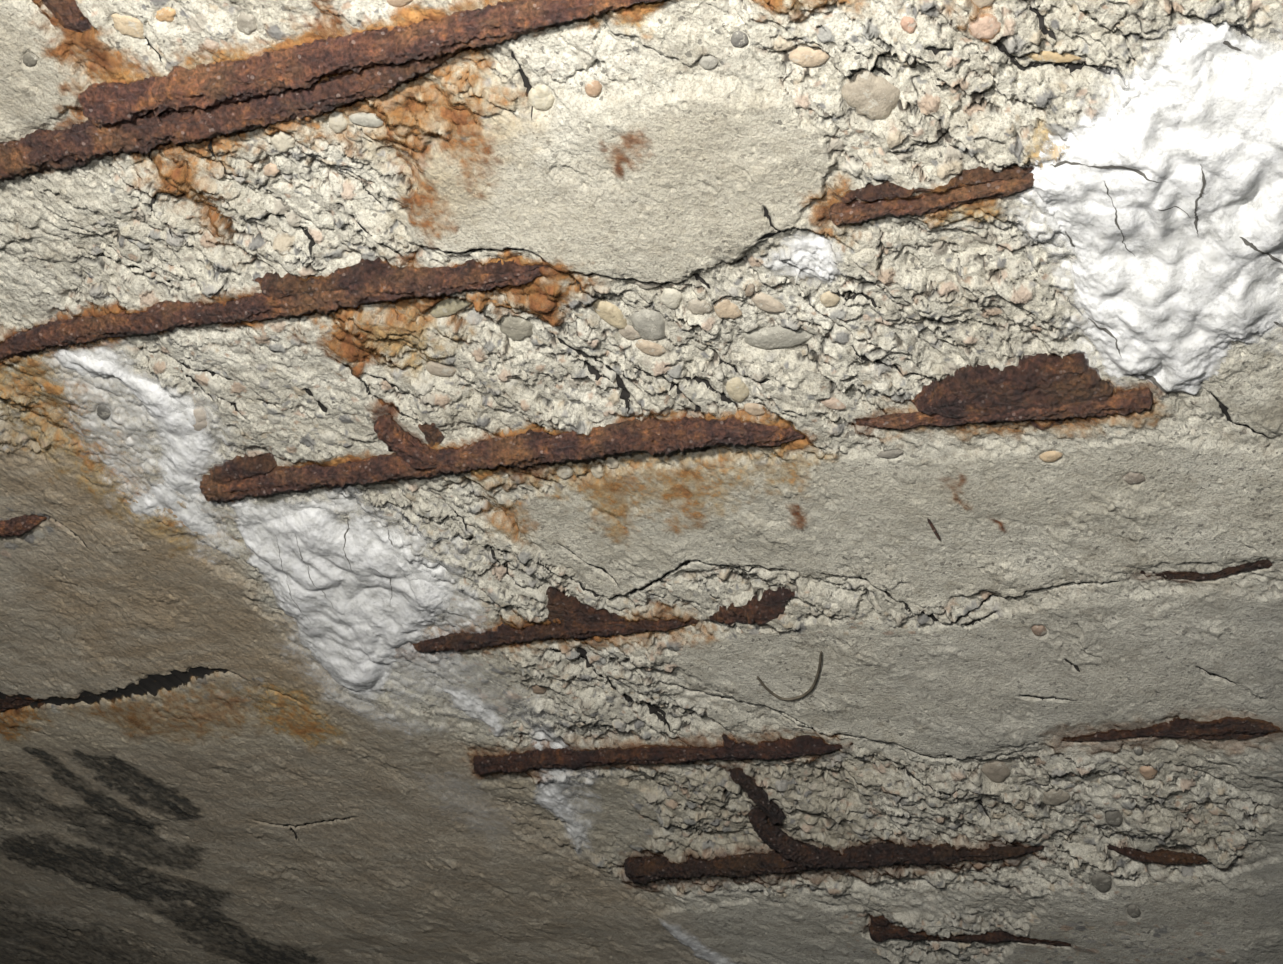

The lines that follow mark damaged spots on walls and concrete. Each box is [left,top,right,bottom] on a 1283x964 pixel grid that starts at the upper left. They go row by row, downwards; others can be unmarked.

spalling [52,47,555,322]
rust [0,0,666,238]
spalling [723,0,1283,189]
crack [982,6,1128,88]
efflorescence [1018,21,1283,395]
efflorescence [53,342,485,699]
rust [0,249,810,550]
spalling [128,201,1108,748]
crack [551,333,770,419]
rust [856,352,1158,436]
crack [0,667,250,709]
damp [0,747,316,964]